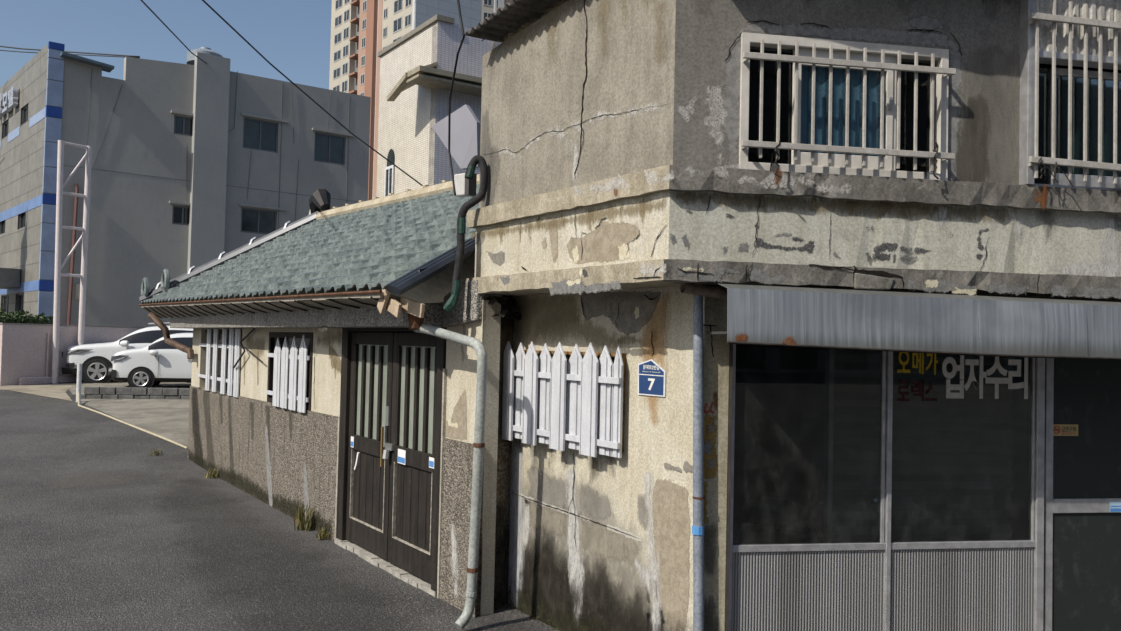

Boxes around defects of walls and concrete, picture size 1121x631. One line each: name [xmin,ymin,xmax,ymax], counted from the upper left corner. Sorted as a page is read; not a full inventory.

crack [484,0,665,179]
peeling [542,217,661,335]
peeling [676,223,815,286]
peeling [865,243,930,263]
peeling [906,279,1029,296]
peeling [1051,284,1121,299]
damp [480,443,662,631]
damp [704,527,716,573]
damp [704,599,719,631]